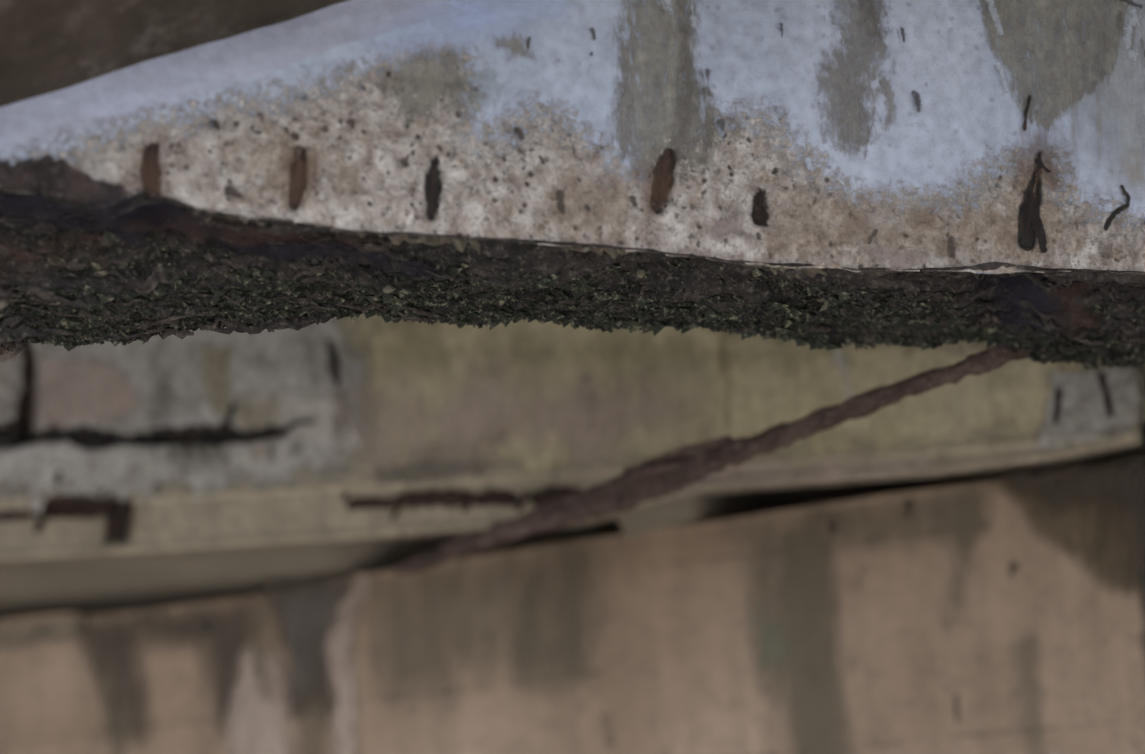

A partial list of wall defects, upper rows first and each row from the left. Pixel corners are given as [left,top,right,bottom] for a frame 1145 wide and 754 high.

peeling [496,32,531,54]
spalling [0,40,1145,279]
leakage [615,0,718,182]
leakage [820,0,895,150]
rust [103,500,134,545]
crack [0,343,314,454]
spalling [0,317,582,534]
crack [313,340,340,389]
rust [394,343,1031,576]
leakage [996,457,1145,606]
leakage [78,575,369,754]